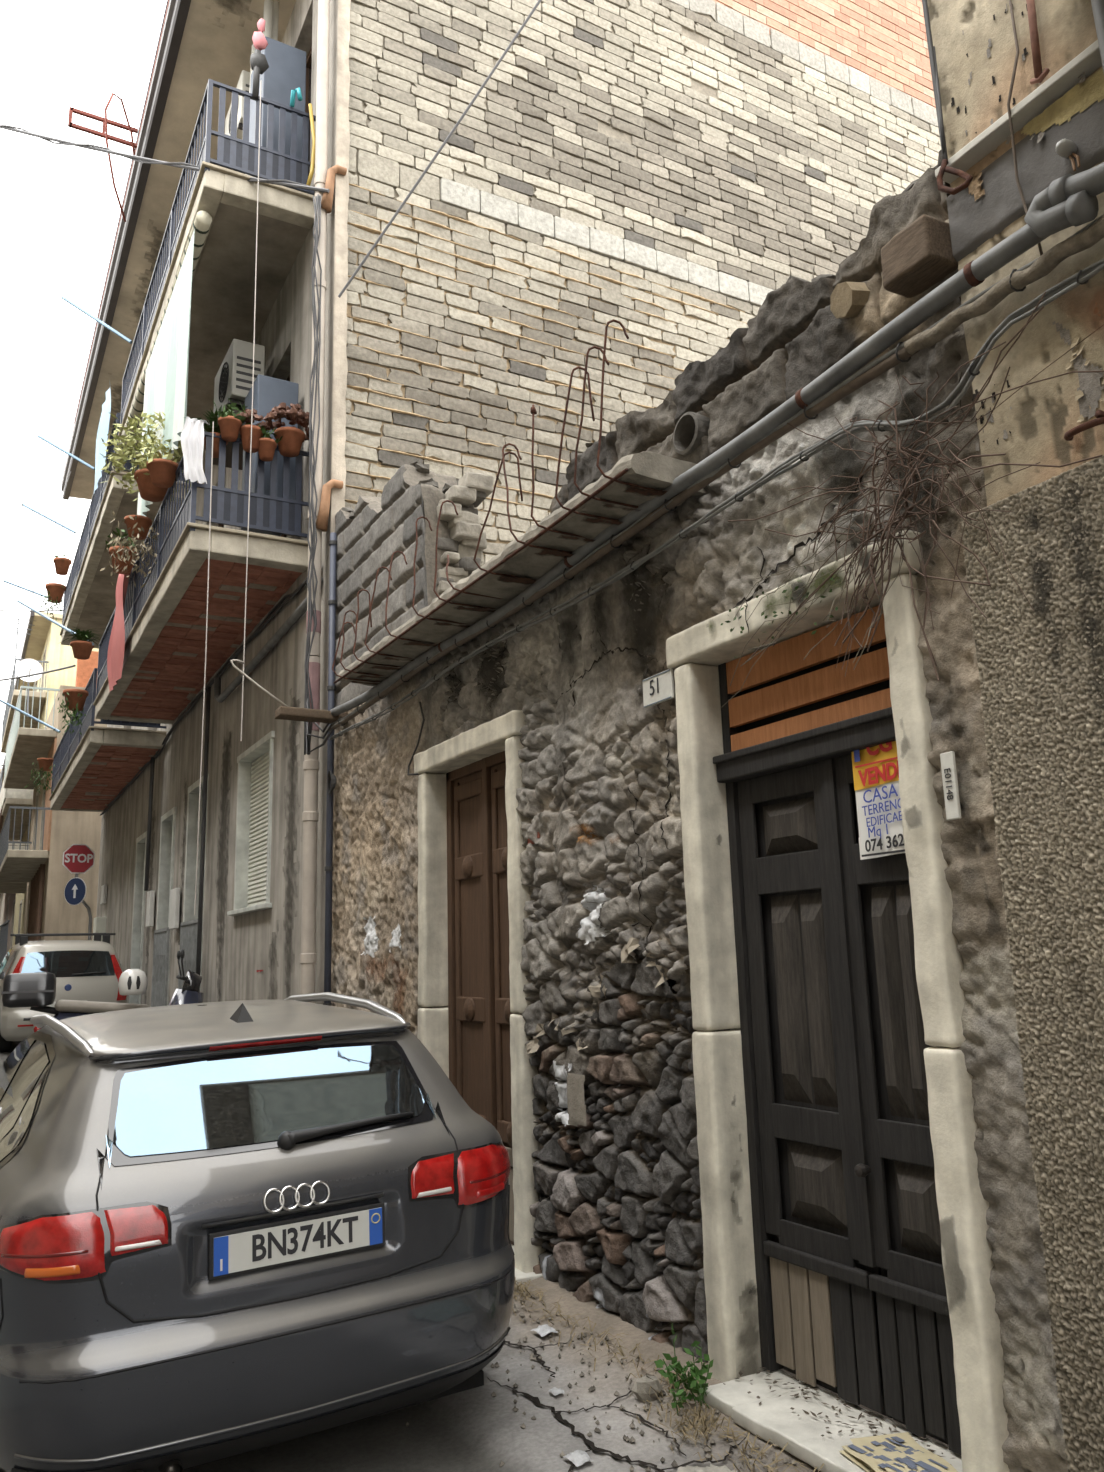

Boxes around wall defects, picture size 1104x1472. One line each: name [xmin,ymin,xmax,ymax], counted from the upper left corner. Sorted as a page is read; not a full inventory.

damp [110,387,122,426]
flaking render [972,379,1012,451]
flaking render [1052,321,1104,422]
spalling [436,485,487,594]
spalling [535,484,668,558]
crack [732,448,893,633]
damp [1031,560,1050,626]
damp [1082,617,1104,656]
peeling [361,916,401,957]
peeling [577,885,669,988]
peeling [588,974,607,999]
crack [487,1340,747,1472]